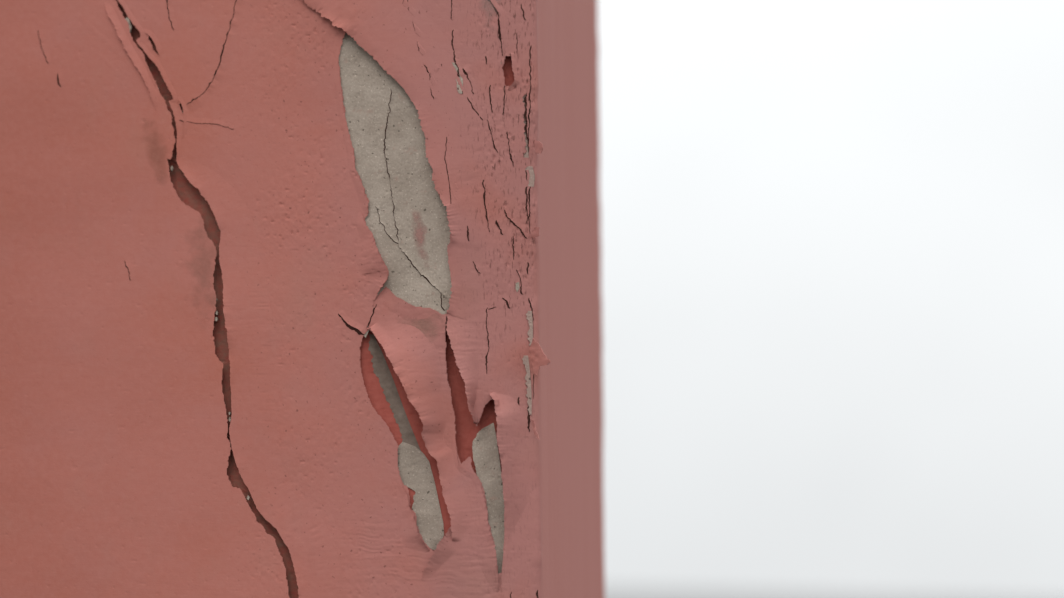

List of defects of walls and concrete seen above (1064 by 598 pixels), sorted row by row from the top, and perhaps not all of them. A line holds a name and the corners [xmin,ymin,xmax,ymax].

crack [403,0,530,167]
crack [104,0,352,598]
crack [338,310,369,335]
peeling [304,0,539,592]
crack [444,136,536,374]